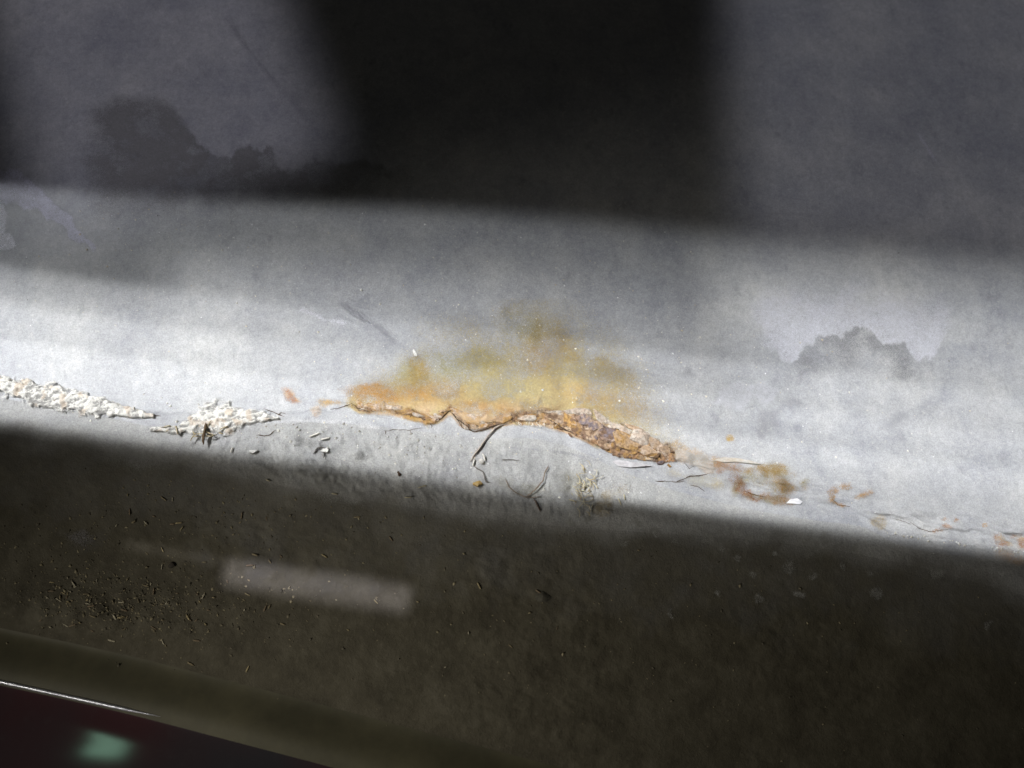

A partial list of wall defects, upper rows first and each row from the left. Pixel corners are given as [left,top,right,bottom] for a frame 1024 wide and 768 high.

leakage [67,90,423,232]
rust [283,298,808,507]
leakage [707,266,957,440]
rust [828,482,875,507]